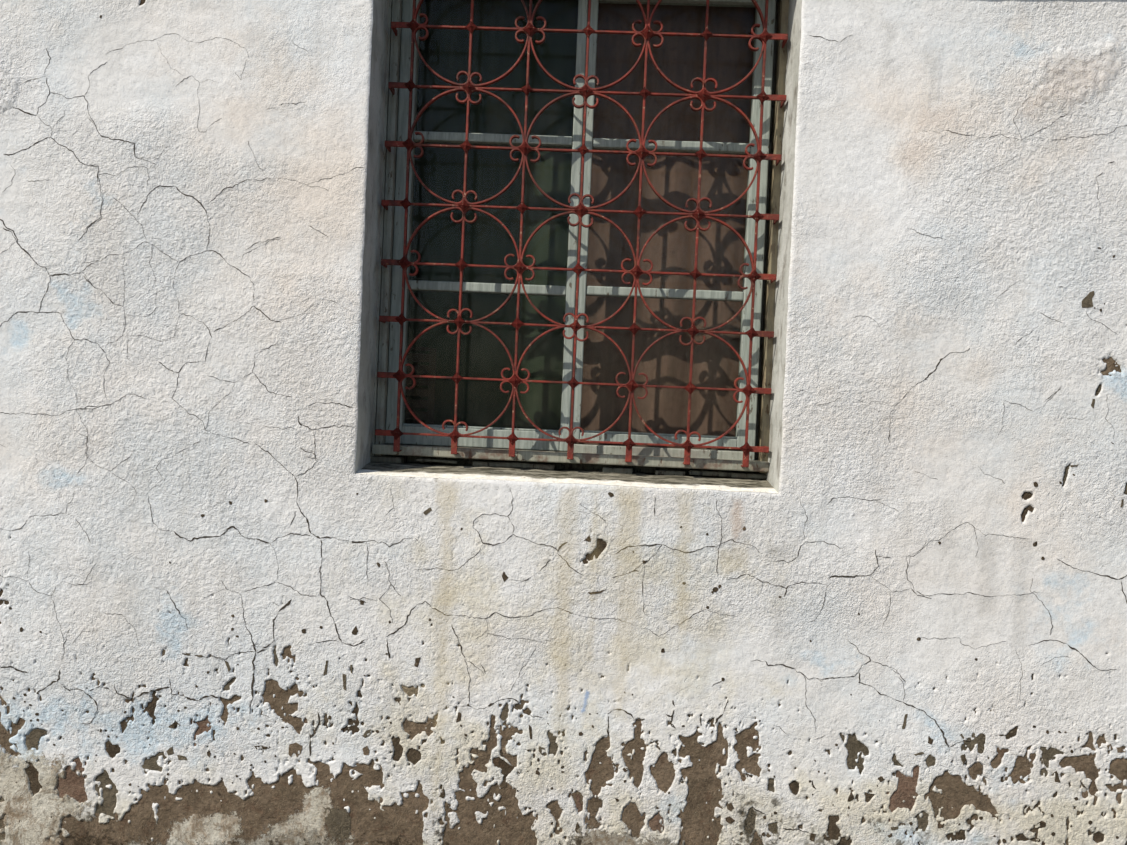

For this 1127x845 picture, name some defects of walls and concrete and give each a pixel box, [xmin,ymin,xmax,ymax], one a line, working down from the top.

crack [0,33,1026,724]
peeling [1091,357,1122,408]
peeling [1021,482,1038,522]
peeling [580,531,607,564]
crack [1058,559,1127,603]
crack [922,587,1116,692]
crack [607,681,728,737]
crack [754,643,971,747]
peeling [0,645,781,845]
peeling [788,725,1127,845]
damp [372,820,452,845]
damp [725,810,782,845]